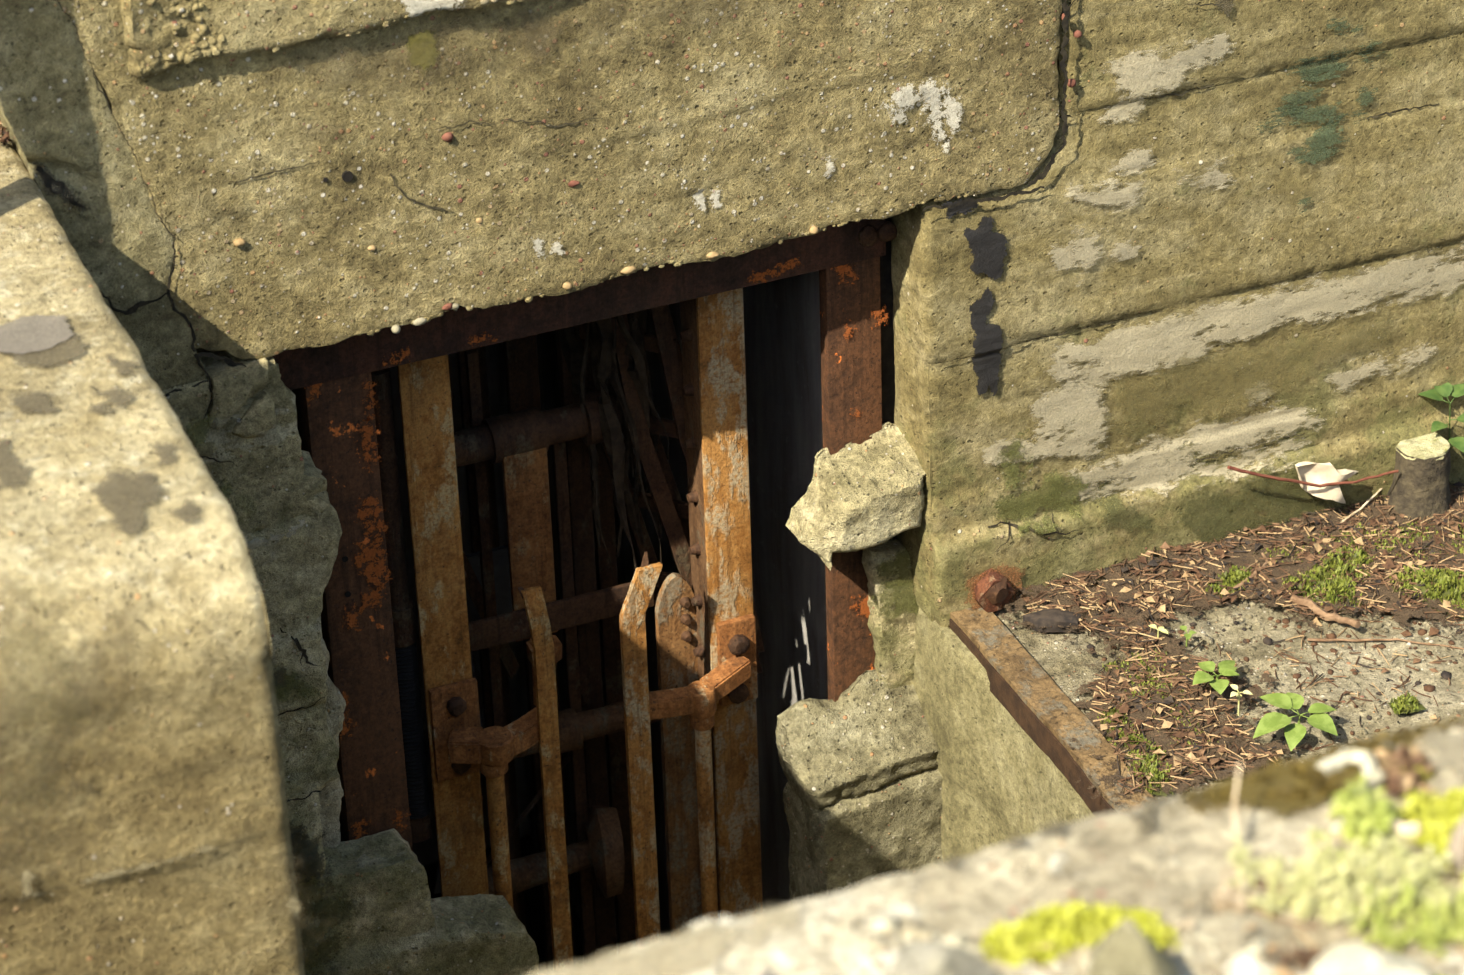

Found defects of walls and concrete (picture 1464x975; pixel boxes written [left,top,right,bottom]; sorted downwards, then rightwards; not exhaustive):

crack [923,0,1075,211]
peeling [1097,31,1237,123]
crack [55,0,246,412]
peeling [1048,149,1157,286]
peeling [1178,154,1237,190]
rust [747,258,800,285]
leakage [0,314,74,355]
rust [840,306,889,341]
peeling [1001,245,1464,501]
crack [200,456,235,465]
rust [342,380,393,631]
rust [849,594,870,618]